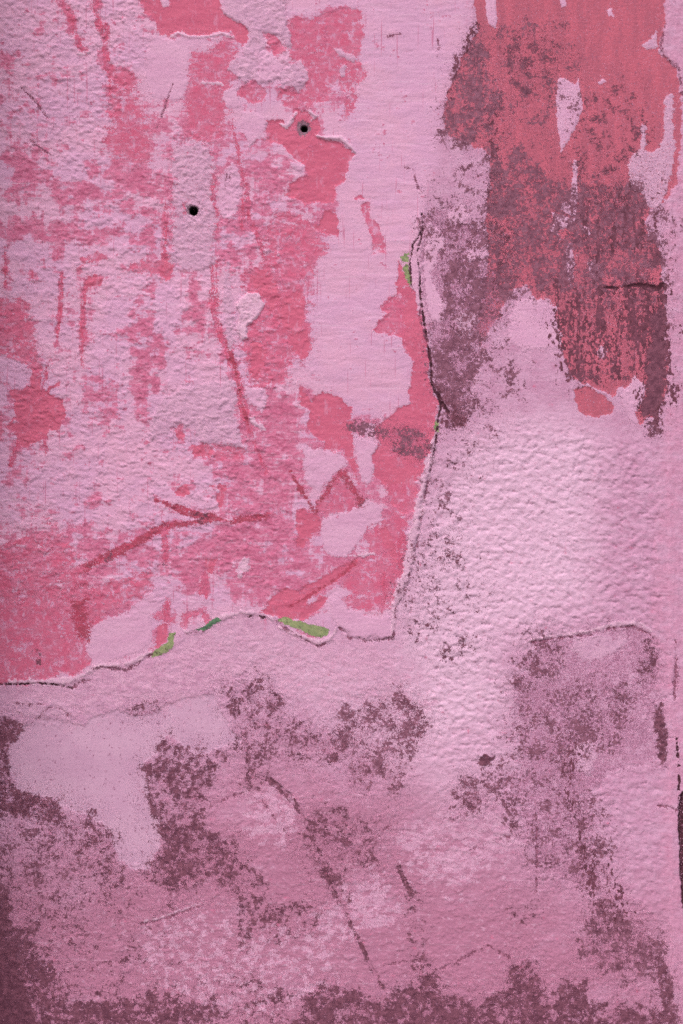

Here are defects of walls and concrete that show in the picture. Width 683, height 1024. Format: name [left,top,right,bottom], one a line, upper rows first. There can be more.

flaking render [0,0,444,872]
damp [336,7,683,680]
peeling [443,0,683,428]
crack [604,282,665,291]
crack [0,654,153,690]
damp [0,611,683,1024]